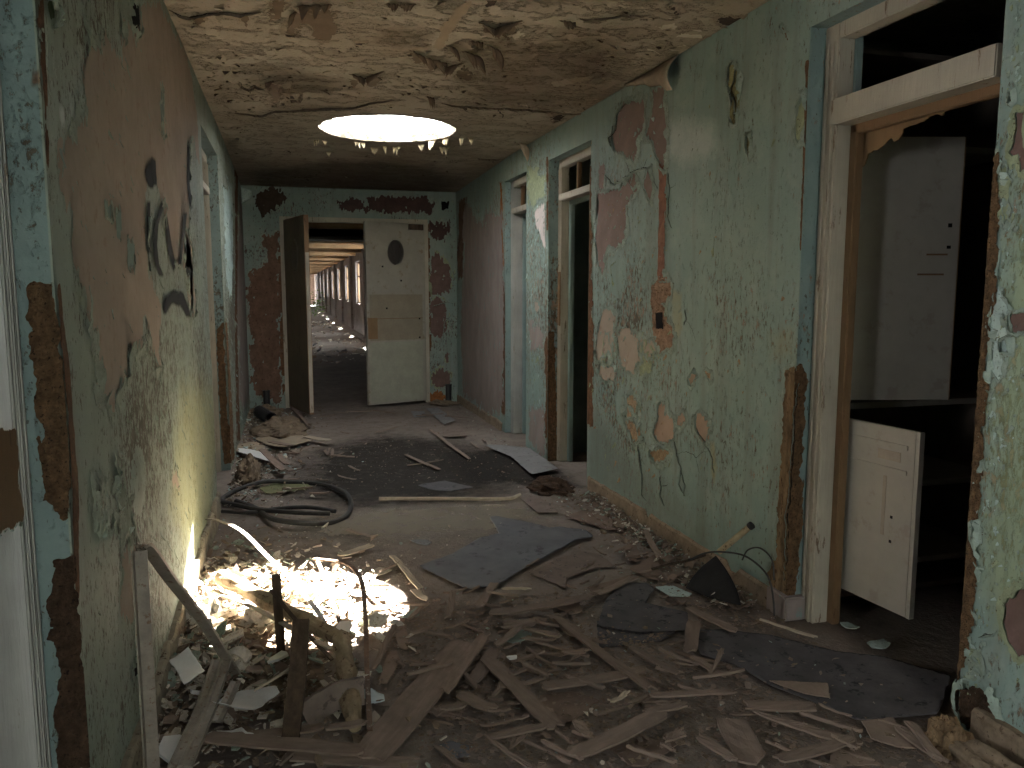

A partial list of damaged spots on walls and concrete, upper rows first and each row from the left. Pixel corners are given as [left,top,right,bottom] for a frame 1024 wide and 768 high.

peeling [376,2,416,25]
peeling [0,428,24,537]
spalling [25,281,71,524]
peeling [57,0,384,466]
peeling [336,192,505,415]
peeling [397,0,756,457]
crack [637,429,714,505]
spalling [765,360,808,596]
peeling [951,0,1024,732]
spalling [46,555,90,768]